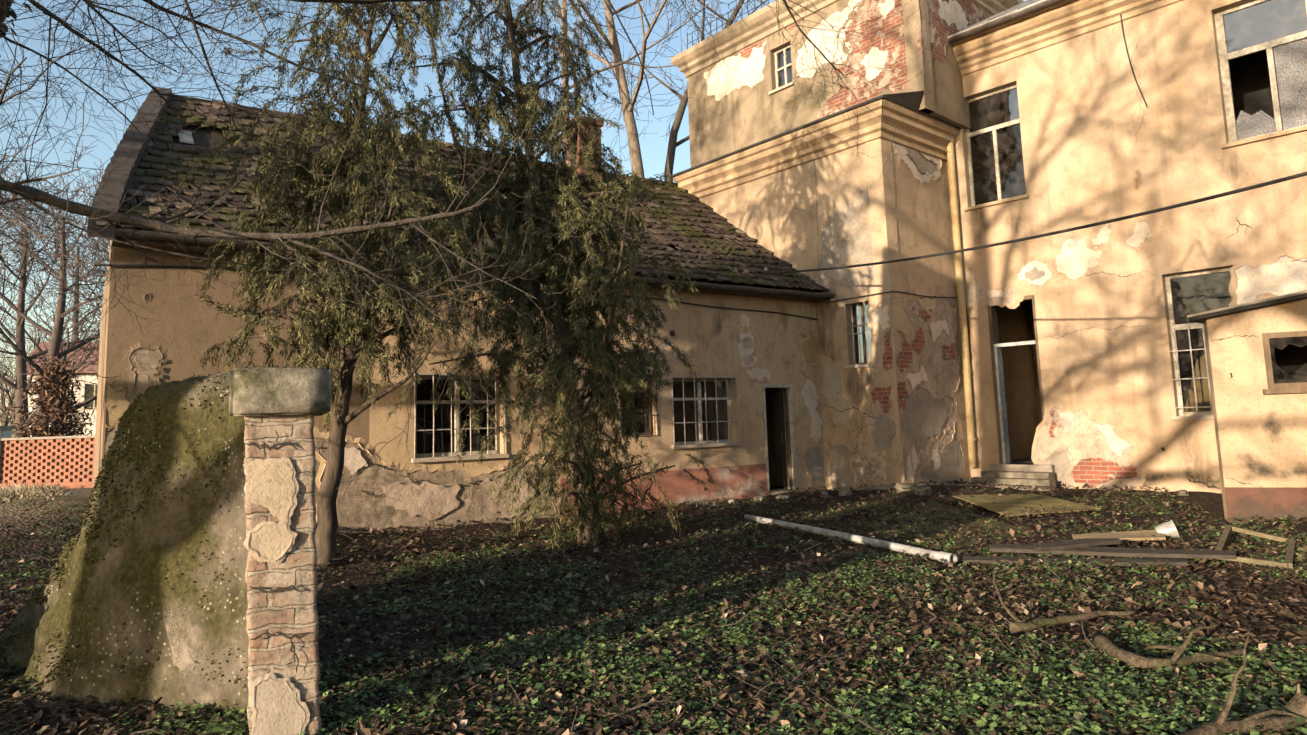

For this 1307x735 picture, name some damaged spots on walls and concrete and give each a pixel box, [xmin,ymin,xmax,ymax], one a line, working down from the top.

flaking render [702,0,986,121]
peeling [891,142,942,187]
spalling [1228,250,1307,306]
spalling [798,217,1157,491]
flaking render [248,461,295,559]